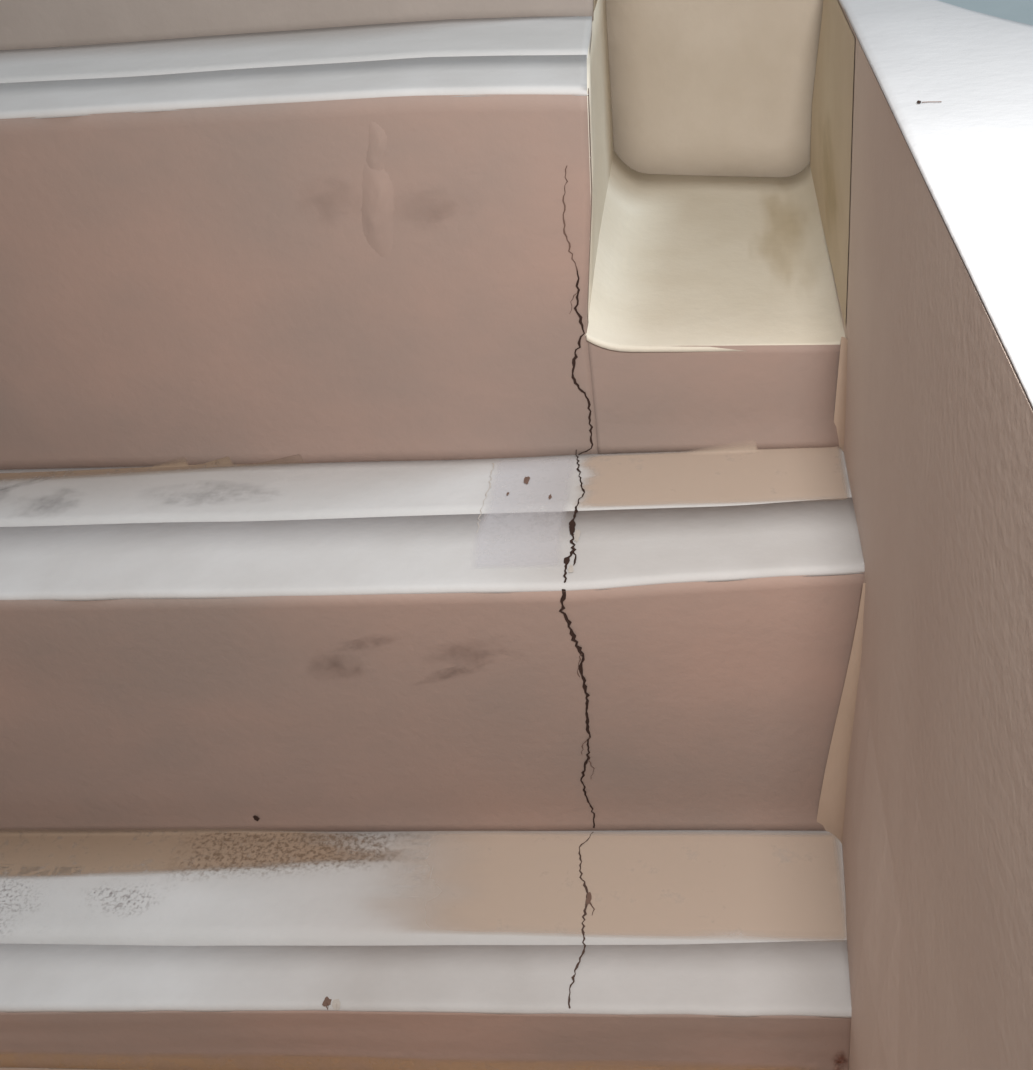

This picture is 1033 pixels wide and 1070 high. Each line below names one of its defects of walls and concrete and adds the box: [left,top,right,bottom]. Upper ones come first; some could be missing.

crack [559,166,595,1008]